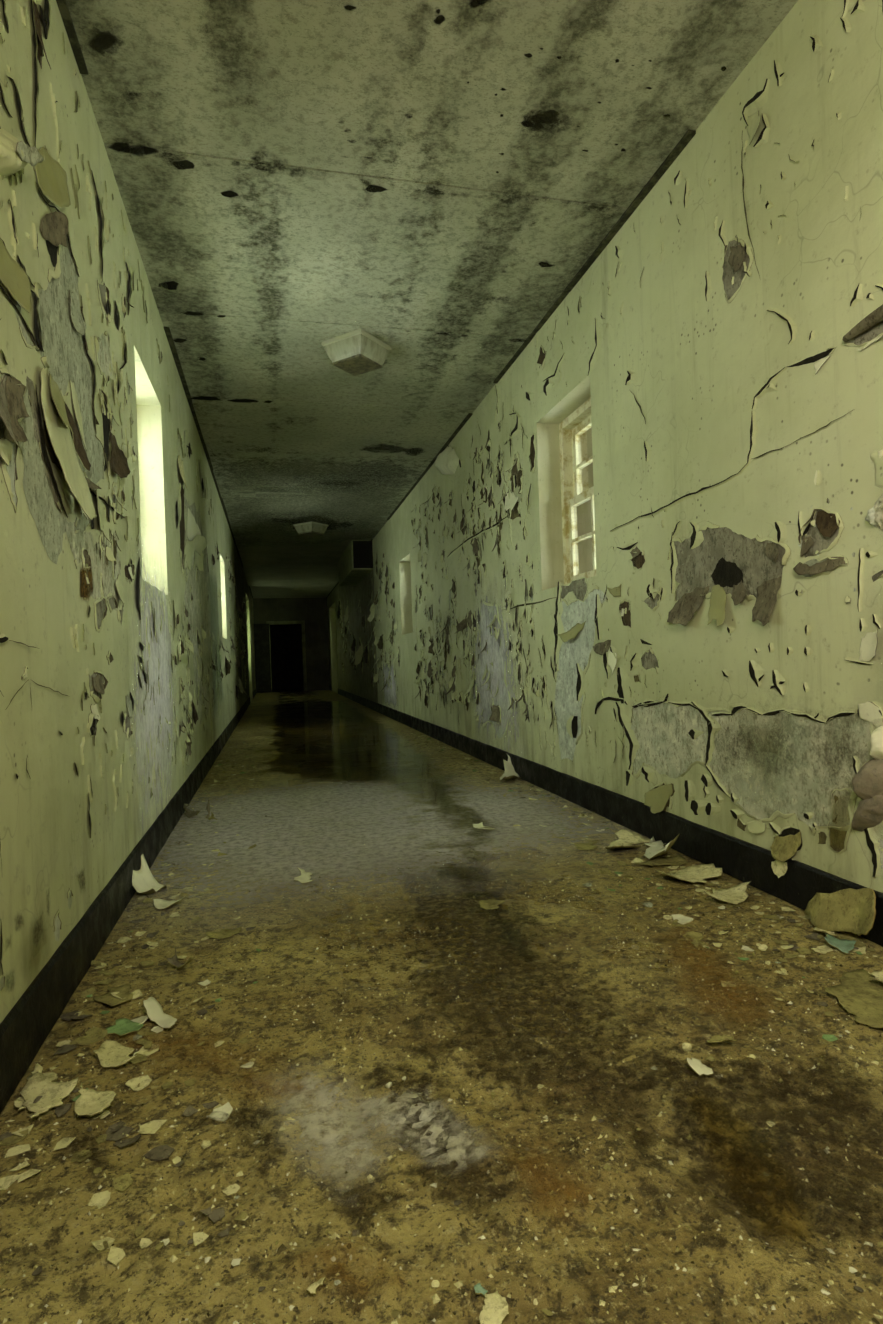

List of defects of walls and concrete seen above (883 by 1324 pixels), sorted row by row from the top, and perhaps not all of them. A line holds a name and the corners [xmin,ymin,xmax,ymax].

flaking render [0,146,138,632]
peeling [84,651,114,737]
crack [0,0,220,838]
water stain [66,0,274,426]
water stain [221,152,301,372]
water stain [365,182,387,192]
flaking render [337,330,883,1016]
crack [446,140,814,558]
crack [504,308,856,786]
crack [810,0,865,120]
peeling [0,743,271,1190]
peeling [686,1057,714,1076]